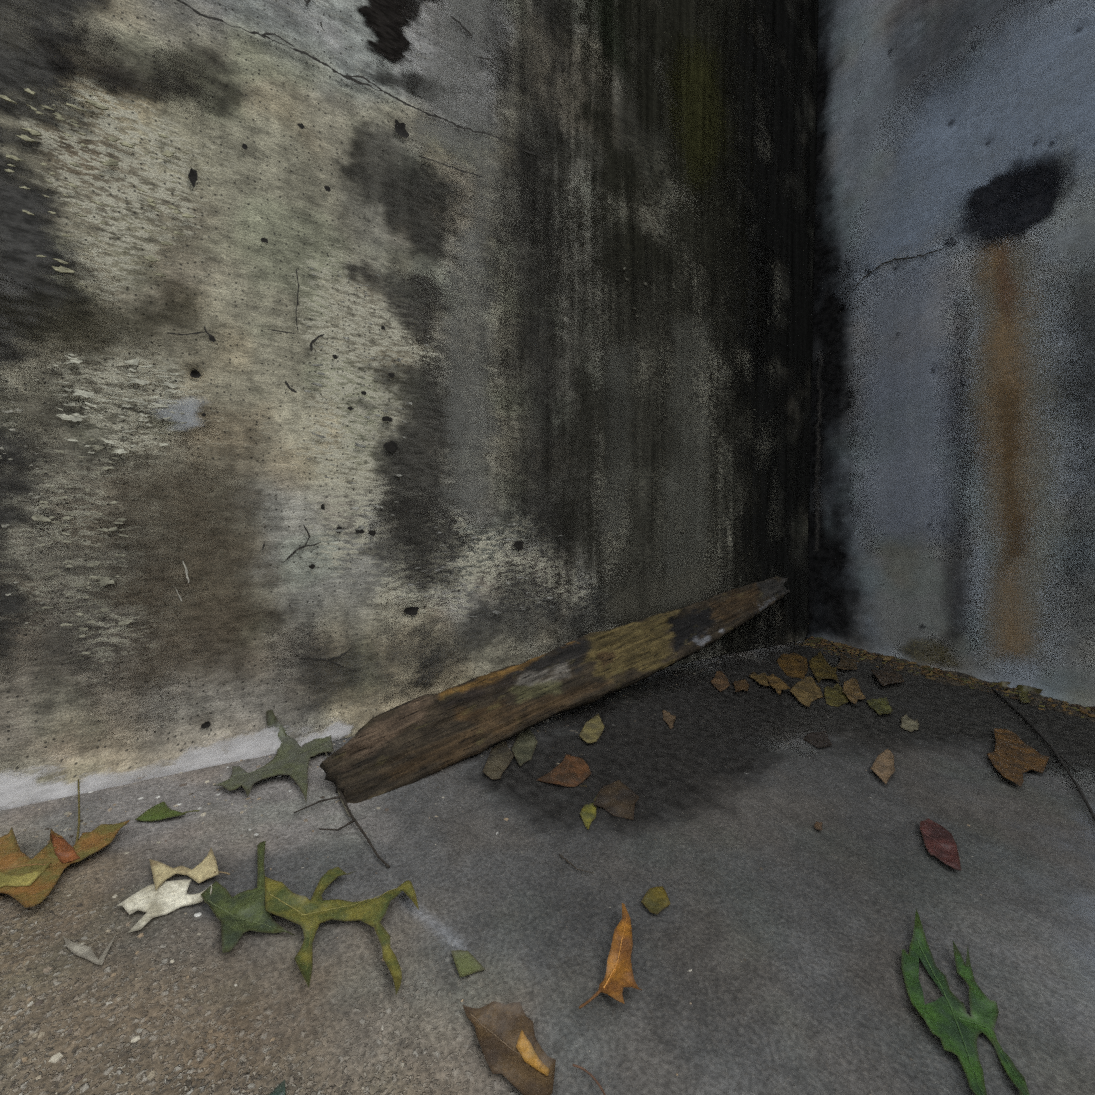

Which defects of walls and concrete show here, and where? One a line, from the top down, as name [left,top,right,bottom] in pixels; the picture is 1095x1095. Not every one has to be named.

leakage [336,127,459,258]
leakage [357,0,489,147]
leakage [880,14,1095,258]
leakage [495,0,758,627]
crack [855,248,943,287]
leakage [346,264,499,574]
leakage [415,566,542,685]